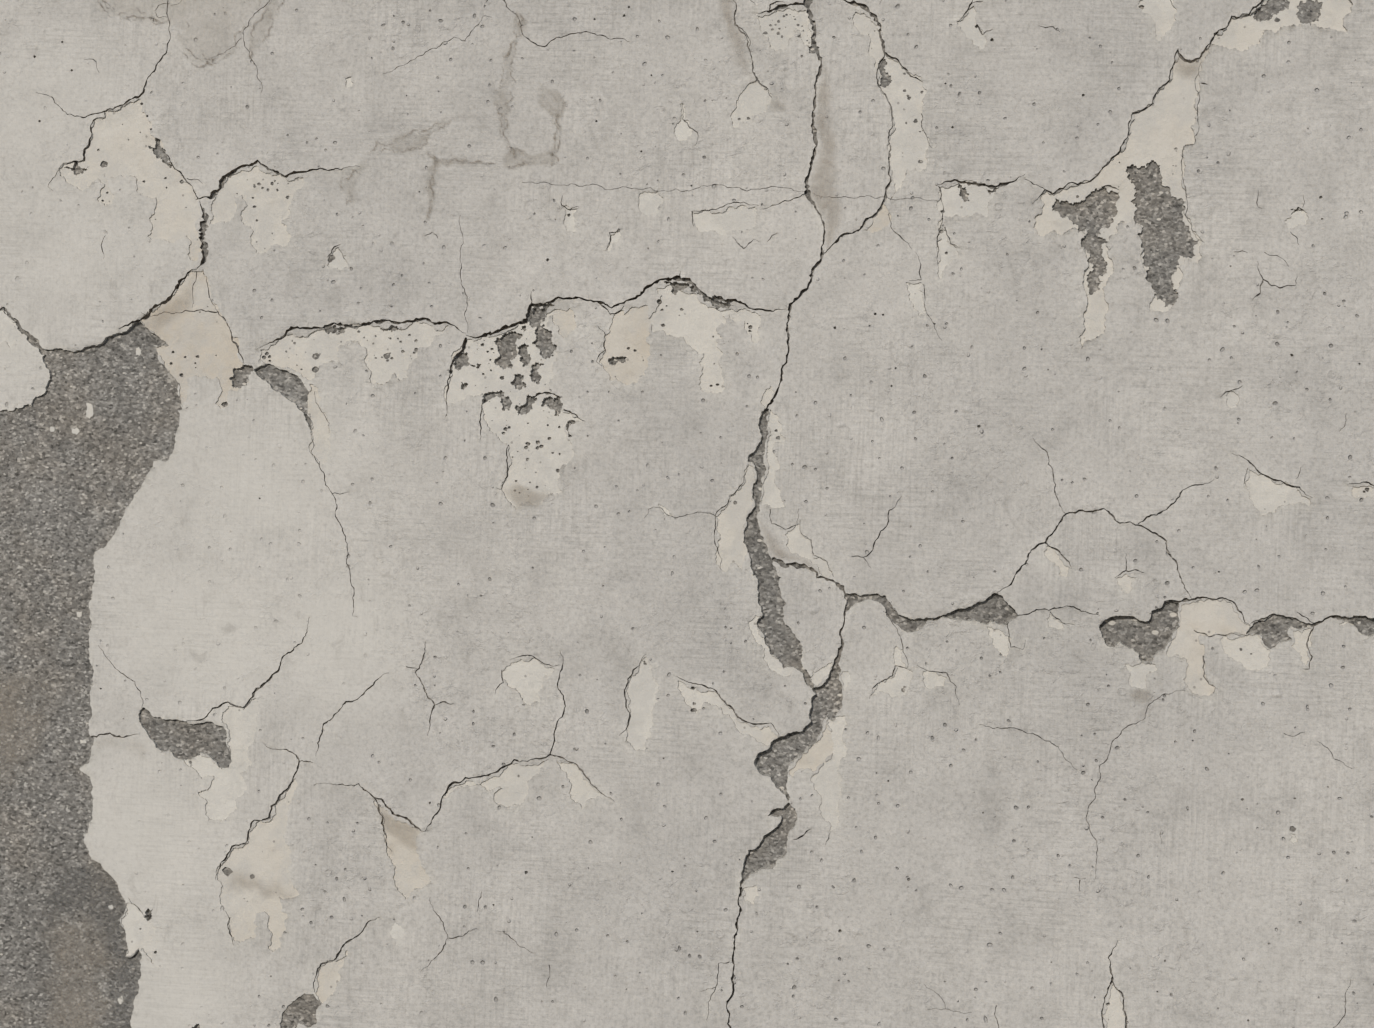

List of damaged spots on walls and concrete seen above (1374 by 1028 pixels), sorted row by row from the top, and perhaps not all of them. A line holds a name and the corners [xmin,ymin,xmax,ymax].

crack [134,143,341,356]
crack [272,0,1263,412]
peeling [1034,0,1352,348]
peeling [444,304,582,509]
peeling [0,99,448,1028]
crack [220,653,604,868]
spalling [678,387,852,904]
crack [770,496,902,669]
spalling [847,593,1018,657]
crack [982,440,1374,891]
peeling [1100,598,1312,696]
crack [709,887,743,1027]